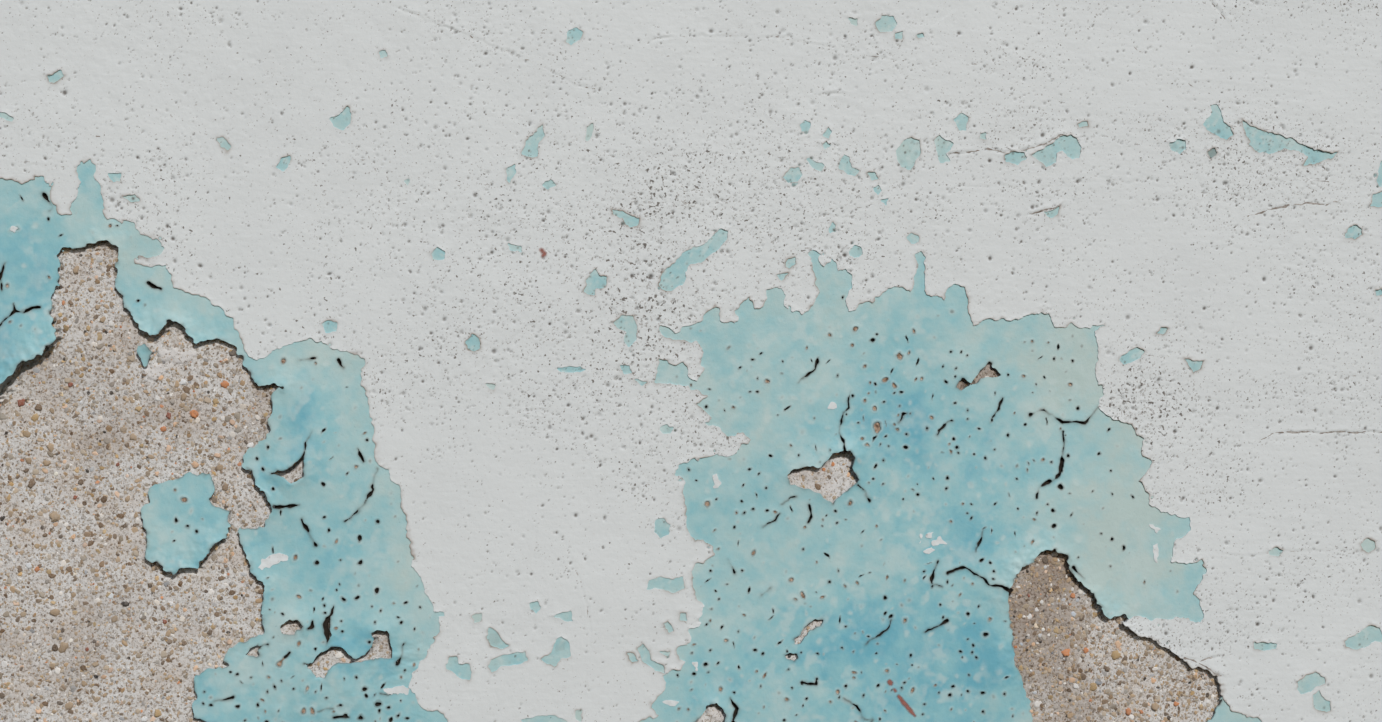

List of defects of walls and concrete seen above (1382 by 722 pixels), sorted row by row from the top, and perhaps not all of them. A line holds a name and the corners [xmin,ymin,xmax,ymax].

peeling [276,156,291,171]
peeling [1005,121,1088,169]
peeling [1203,104,1337,166]
peeling [465,334,480,351]
spalling [0,159,448,722]
peeling [614,229,1261,722]
peeling [1254,642,1277,651]
peeling [1297,672,1330,712]